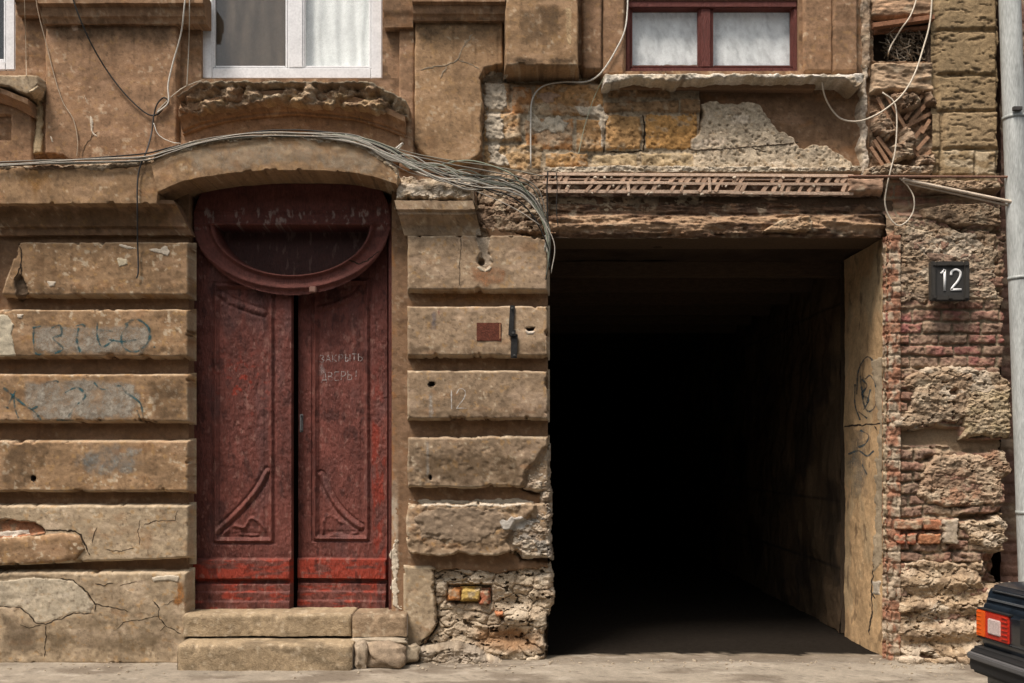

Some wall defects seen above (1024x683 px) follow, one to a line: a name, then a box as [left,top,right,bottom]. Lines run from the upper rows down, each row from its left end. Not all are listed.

flaking render [481,0,937,180]
flaking render [549,196,699,215]
spalling [871,357,1012,595]
flaking render [0,519,46,538]
crack [46,511,178,555]
spalling [351,443,555,669]
crack [0,578,181,657]
spalling [898,559,1010,660]